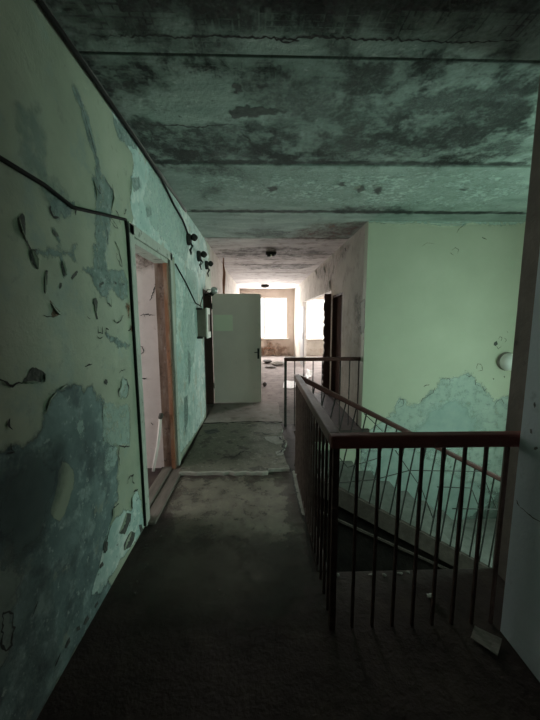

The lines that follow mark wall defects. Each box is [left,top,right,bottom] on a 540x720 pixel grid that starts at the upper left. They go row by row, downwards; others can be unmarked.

crack [92,25,518,44]
water stain [85,57,164,100]
water stain [127,59,539,168]
peeling [18,87,128,319]
spalling [0,367,46,388]
peeling [369,364,509,432]
peeling [360,447,504,520]
peeling [0,379,144,720]